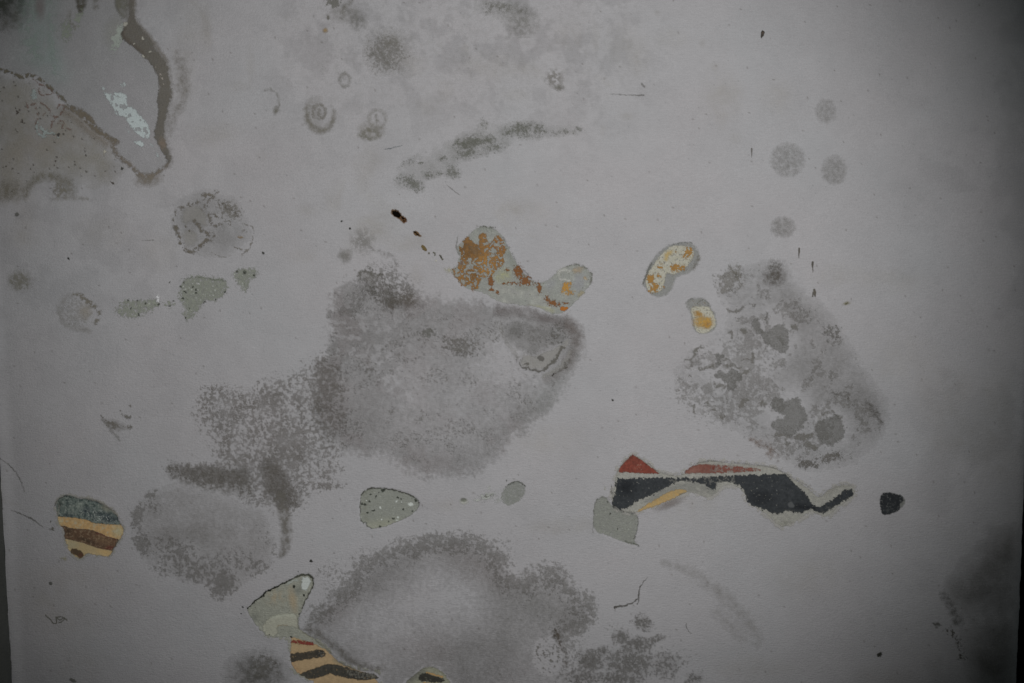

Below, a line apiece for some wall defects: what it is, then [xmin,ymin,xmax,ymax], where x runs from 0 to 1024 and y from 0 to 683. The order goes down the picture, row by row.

flaking render [0,0,172,183]
flaking render [115,267,256,319]
flaking render [448,226,592,314]
flaking render [644,243,699,296]
flaking render [687,299,716,333]
damp [739,399,843,469]
flaking render [359,487,419,529]
flaking render [593,497,638,545]